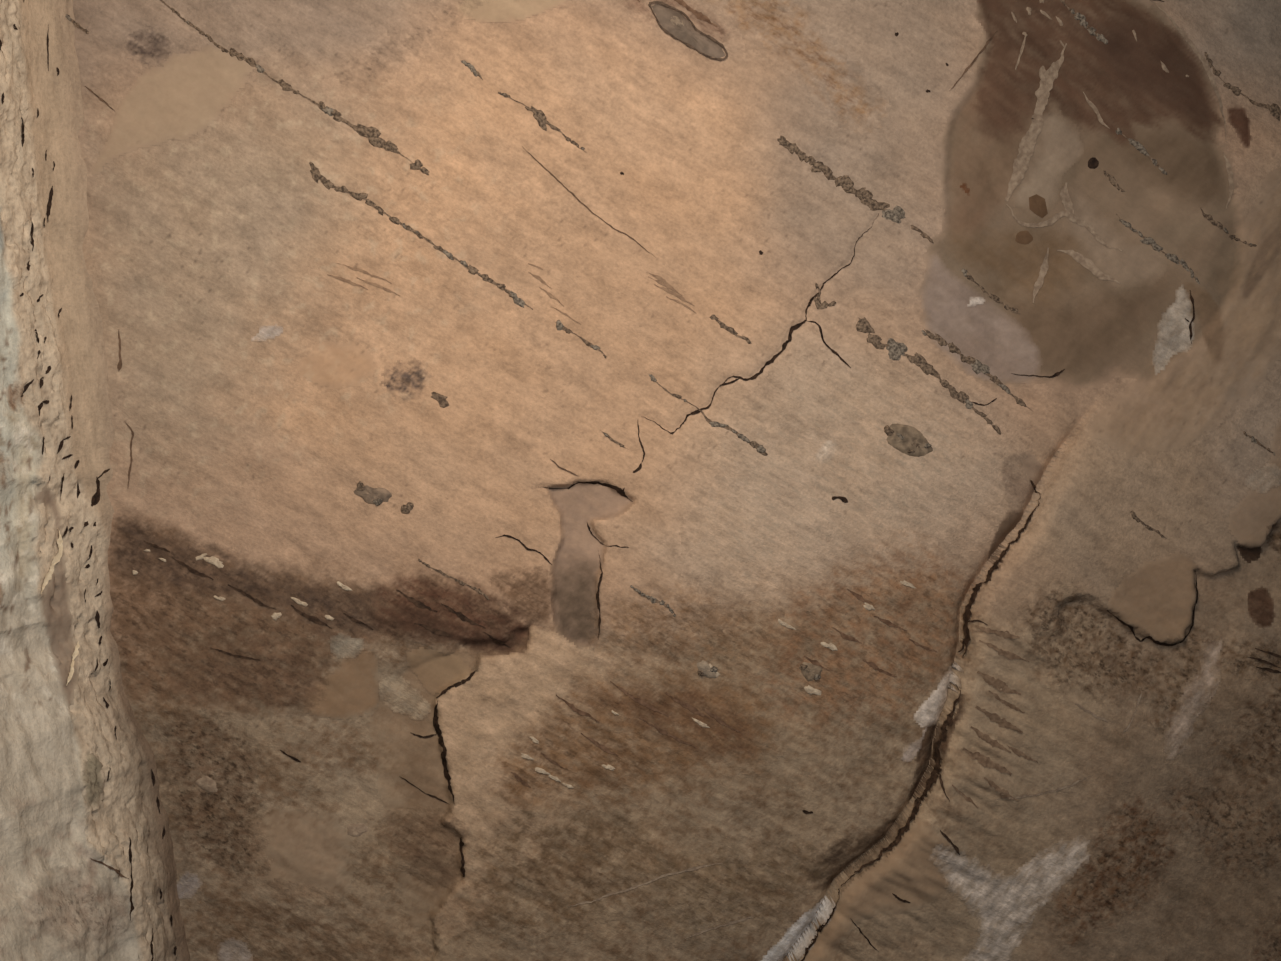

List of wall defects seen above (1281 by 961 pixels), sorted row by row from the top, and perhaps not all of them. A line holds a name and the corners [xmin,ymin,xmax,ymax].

damp [616,0,740,47]
damp [936,0,1227,315]
crack [544,214,879,502]
damp [1152,284,1195,375]
spalling [547,479,635,571]
damp [347,343,1036,961]
peeling [1107,551,1198,645]
spalling [1248,585,1276,630]
crack [399,670,477,804]
crack [801,480,1041,961]
damp [926,576,1281,961]
crack [458,837,466,877]